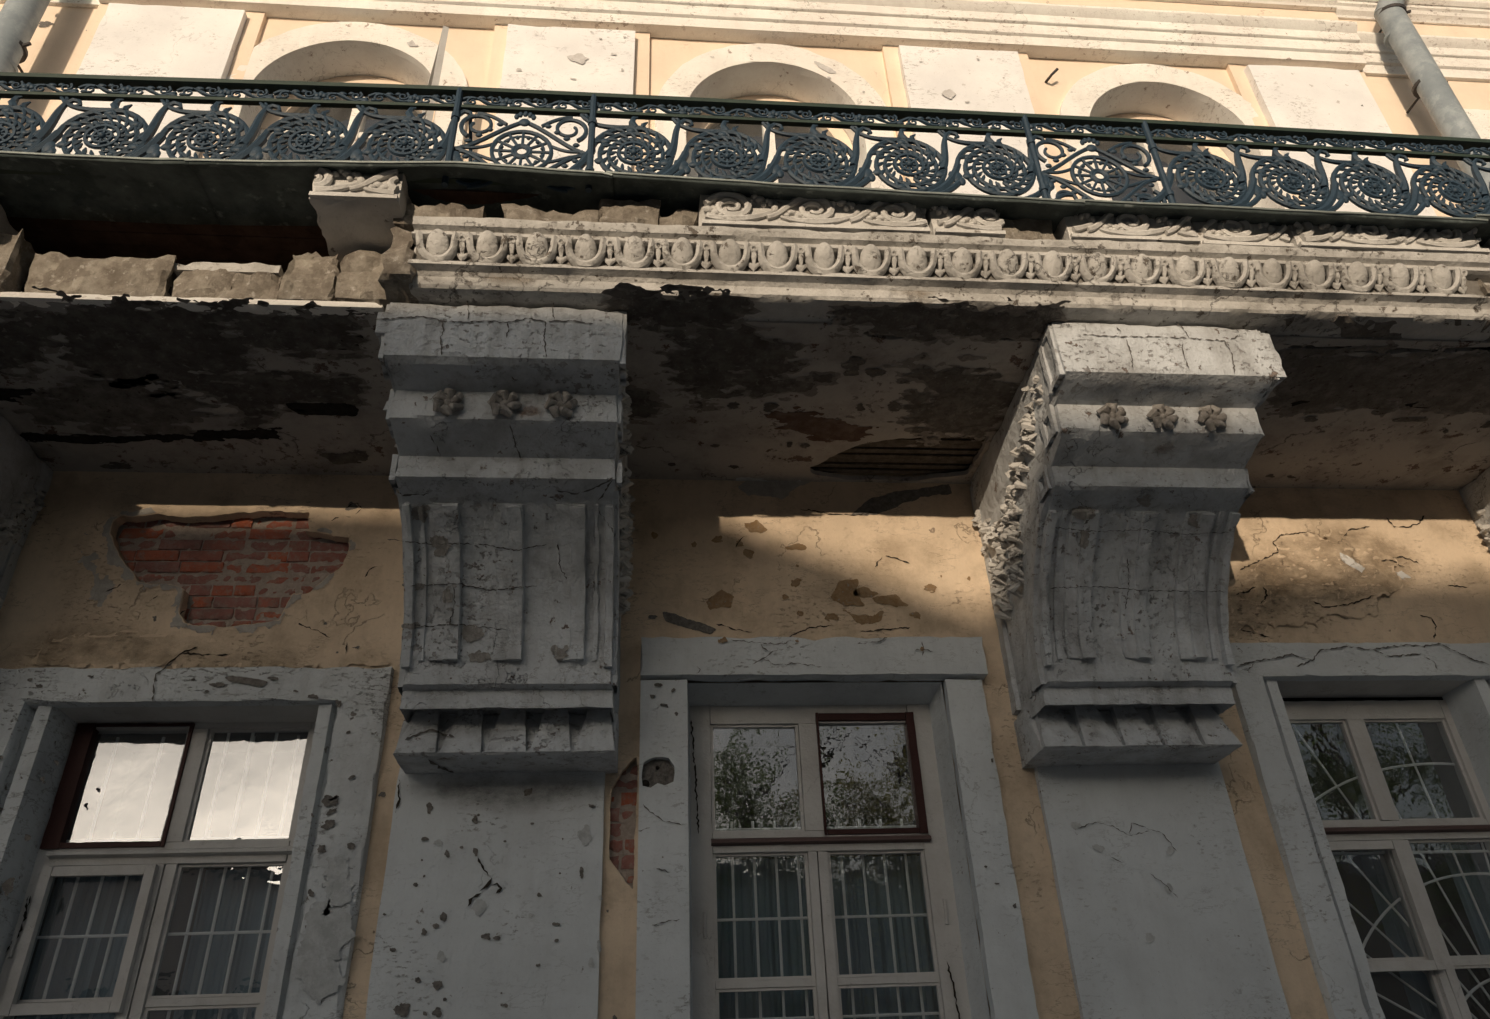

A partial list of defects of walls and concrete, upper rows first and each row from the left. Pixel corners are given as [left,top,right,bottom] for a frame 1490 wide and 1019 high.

peeling [0,199,698,469]
peeling [597,282,1071,449]
peeling [1255,314,1490,434]
spalling [102,507,356,635]
spalling [648,590,734,643]
peeling [691,520,767,559]
peeling [782,543,807,616]
peeling [824,579,920,625]
crack [1051,501,1487,670]
spalling [562,760,638,889]
peeling [421,912,447,935]
peeling [393,977,447,1017]